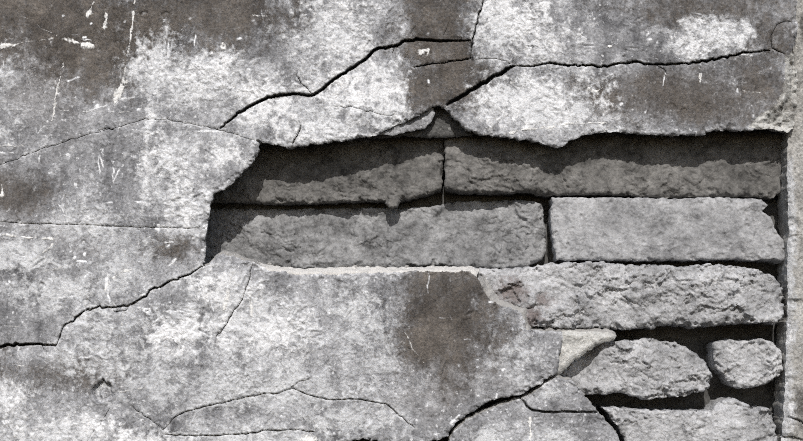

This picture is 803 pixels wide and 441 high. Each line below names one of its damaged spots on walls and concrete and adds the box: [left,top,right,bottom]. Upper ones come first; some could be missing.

crack [5,0,791,163]
crack [0,265,205,349]
peeling [203,105,616,441]